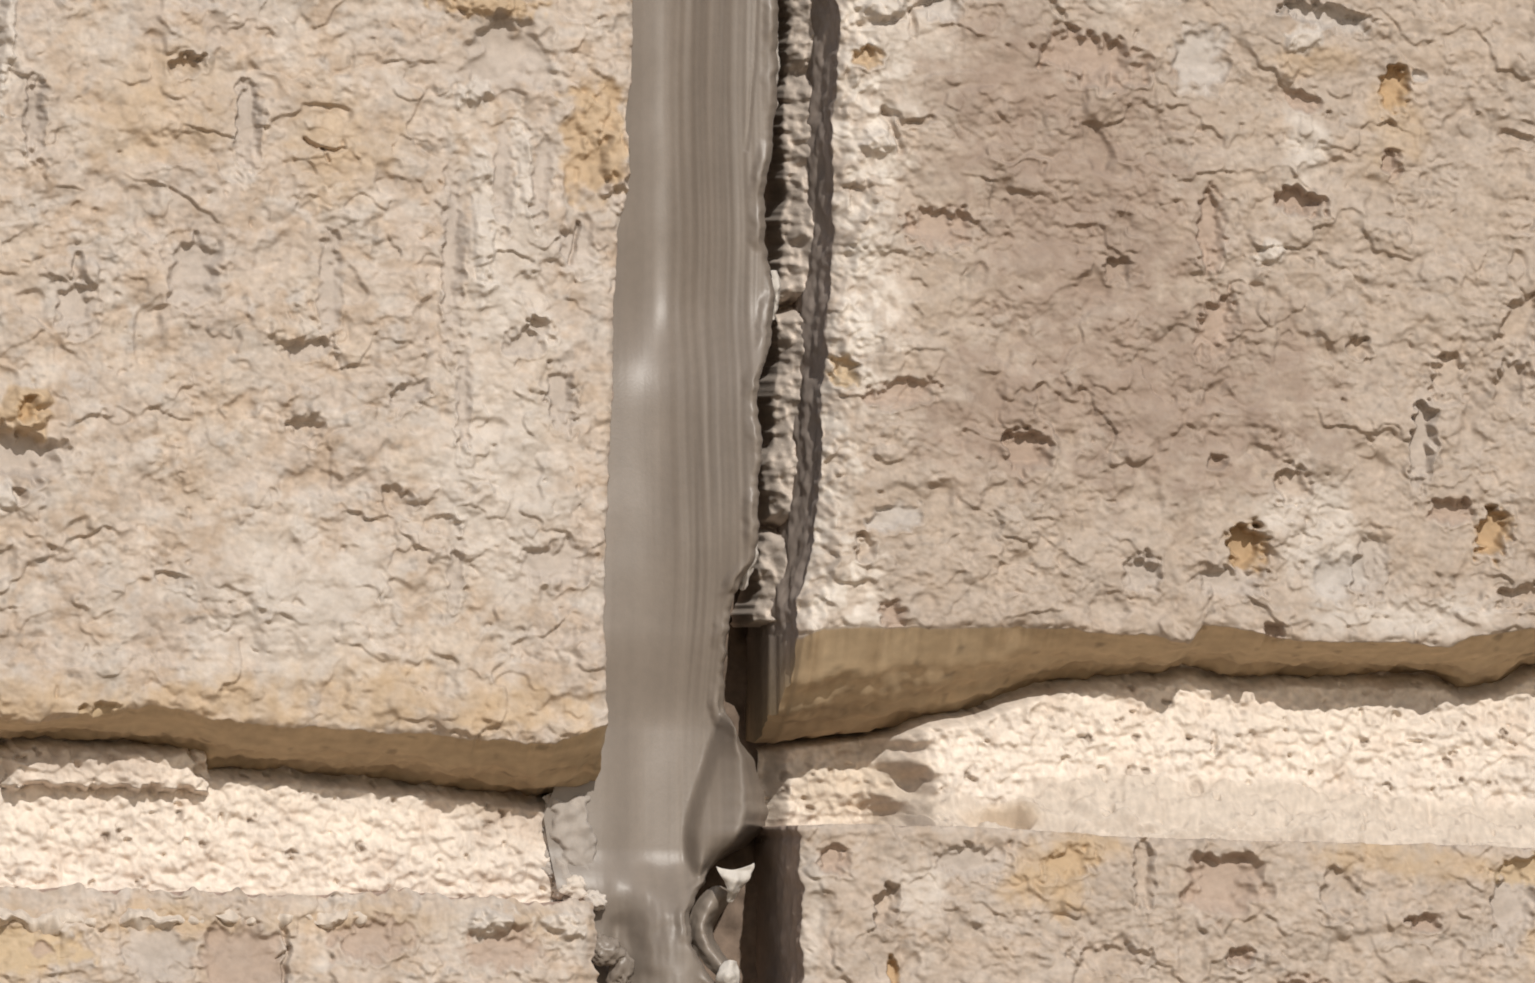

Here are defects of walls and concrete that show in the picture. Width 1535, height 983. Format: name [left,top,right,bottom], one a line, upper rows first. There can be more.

crack [742,0,761,154]
crack [723,589,767,771]
crack [689,838,758,983]